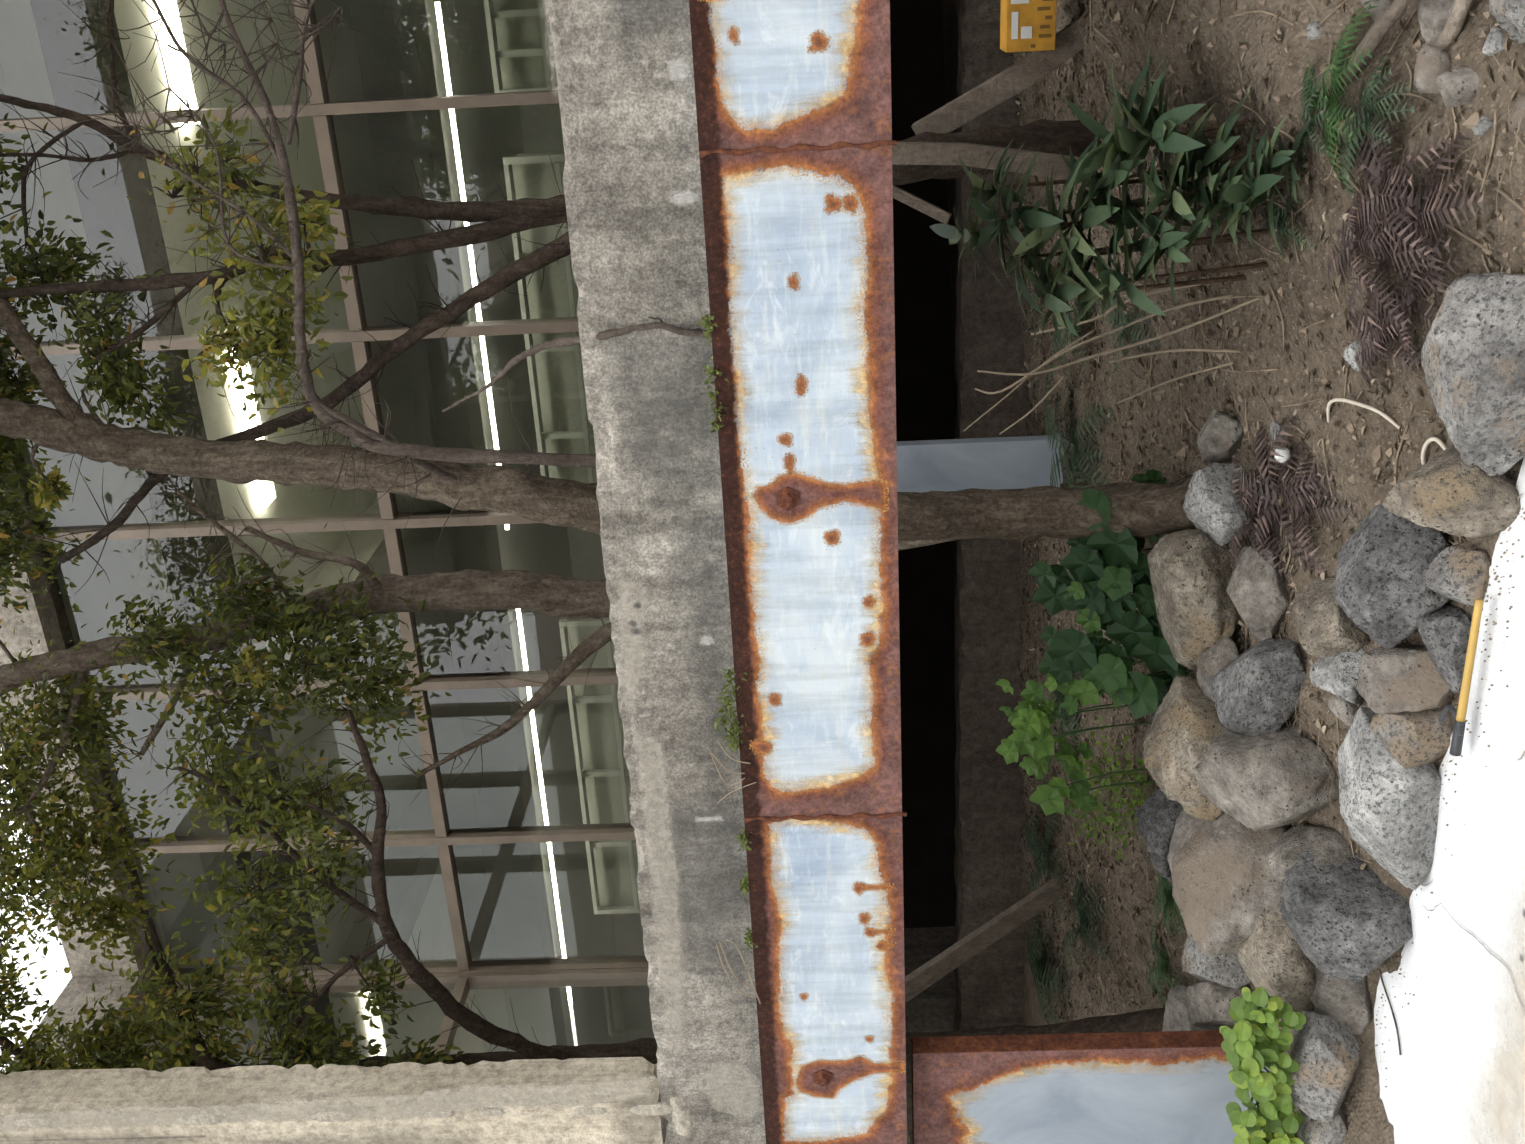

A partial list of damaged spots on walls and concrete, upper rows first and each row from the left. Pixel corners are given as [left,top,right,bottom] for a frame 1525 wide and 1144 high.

corrosion [689,0,1240,1144]